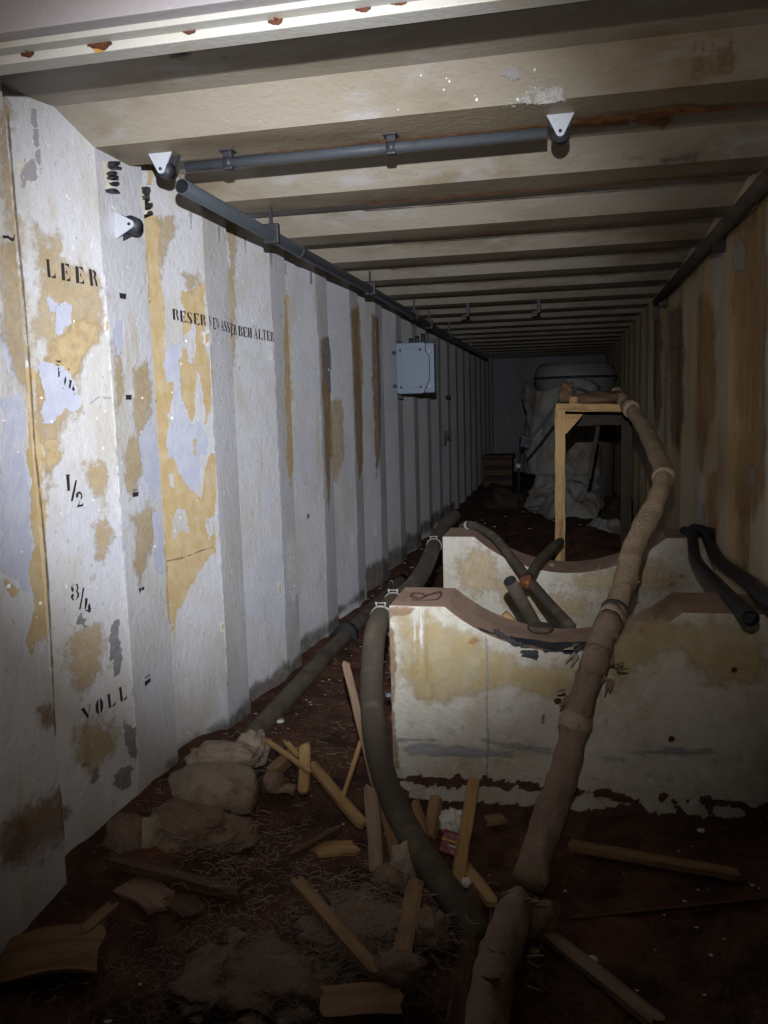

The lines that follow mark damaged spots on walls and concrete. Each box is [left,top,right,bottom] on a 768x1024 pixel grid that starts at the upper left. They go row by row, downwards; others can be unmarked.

corrosion [87,41,112,53]
corrosion [266,125,550,154]
corrosion [571,105,768,129]
peeling [0,224,123,654]
peeling [139,166,228,678]
leakage [283,293,294,487]
leakage [321,307,381,505]
leakage [653,295,717,529]
peeling [385,606,544,809]
leakage [399,609,576,702]
leakage [611,620,766,685]
peeling [569,788,768,827]